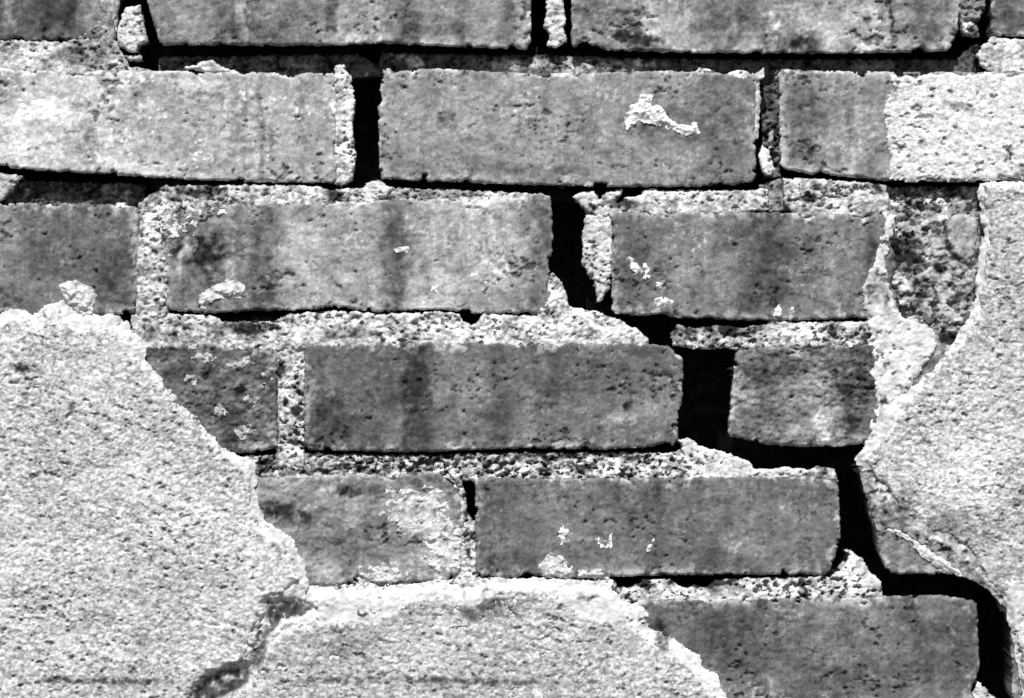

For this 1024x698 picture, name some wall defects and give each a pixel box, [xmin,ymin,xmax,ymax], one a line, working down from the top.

crack [119,0,982,67]
crack [194,602,297,698]
peeling [0,300,726,698]
crack [353,77,1011,698]
peeling [851,181,1024,698]